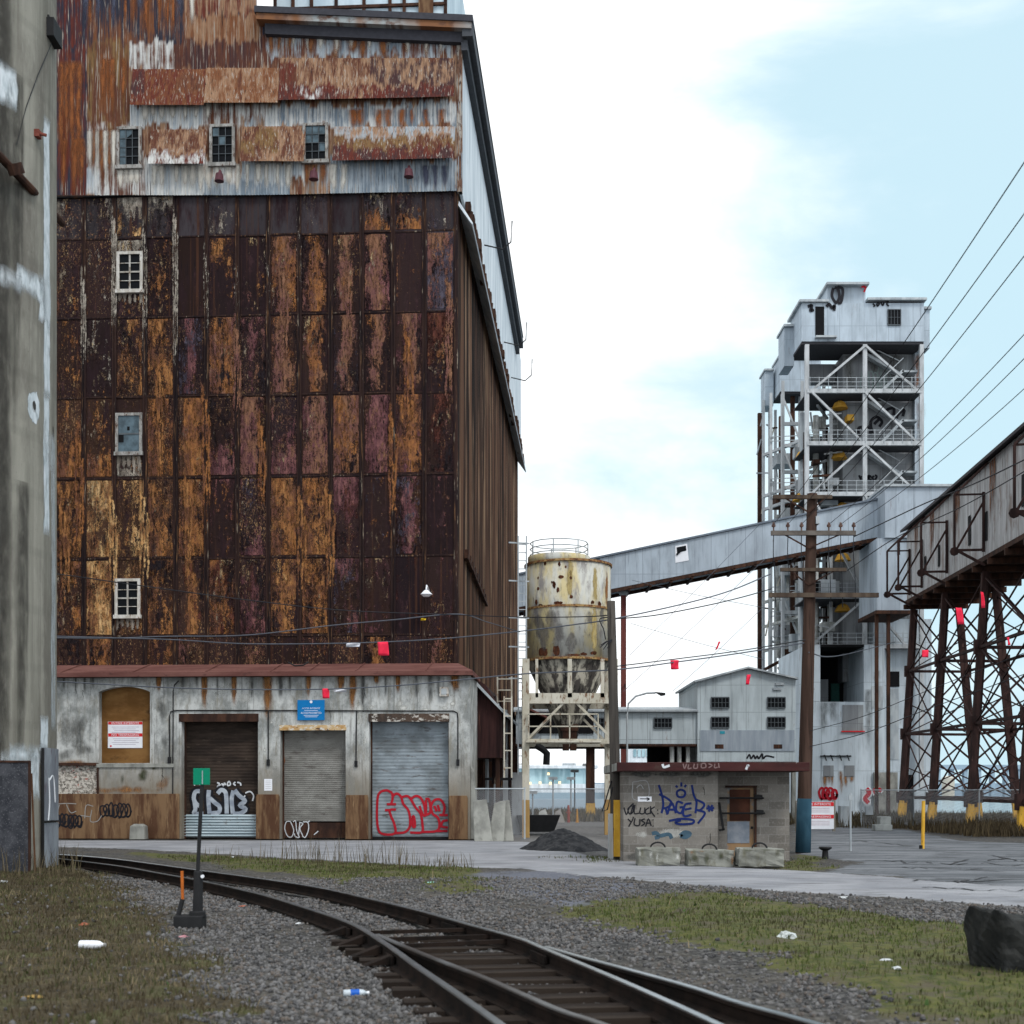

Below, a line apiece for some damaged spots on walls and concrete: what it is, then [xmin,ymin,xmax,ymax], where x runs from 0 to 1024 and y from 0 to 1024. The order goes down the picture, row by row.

corrosion [59,62,112,183]
corrosion [376,109,443,127]
leakage [0,85,23,485]
corrosion [444,267,455,439]
leakage [19,490,28,559]
corrosion [58,426,85,605]
corrosion [109,484,119,603]
corrosion [139,481,158,596]
corrosion [183,384,211,578]
corrosion [388,318,415,523]
corrosion [535,557,608,656]
corrosion [338,676,356,706]